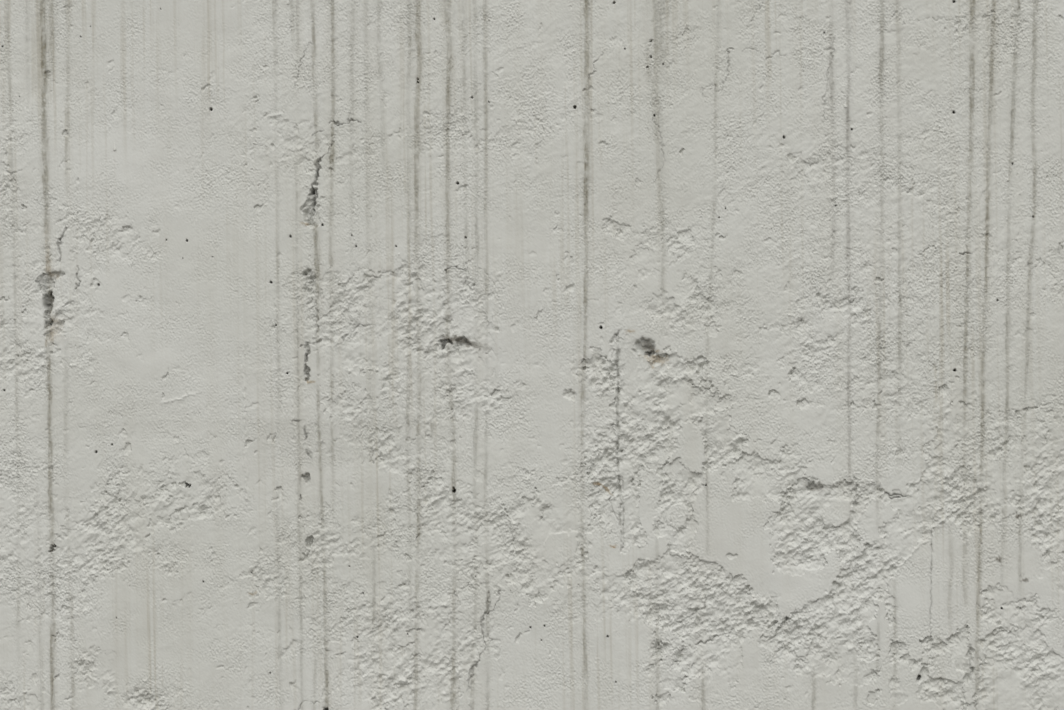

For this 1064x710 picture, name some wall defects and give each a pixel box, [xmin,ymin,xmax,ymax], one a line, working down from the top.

peeling [47,442,239,587]
crack [607,329,625,553]
spalling [305,254,1064,710]